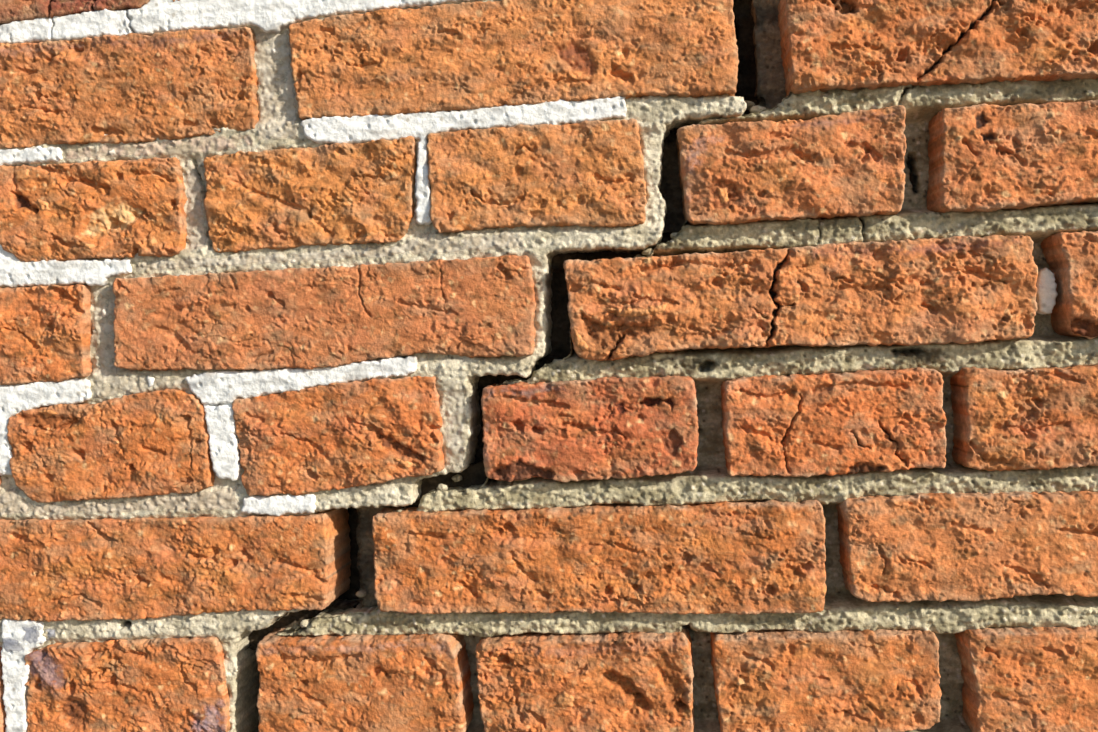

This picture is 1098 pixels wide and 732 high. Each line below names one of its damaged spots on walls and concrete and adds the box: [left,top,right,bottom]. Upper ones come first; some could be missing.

crack [733,0,786,115]
crack [901,2,992,97]
crack [767,258,786,341]
crack [247,128,685,650]